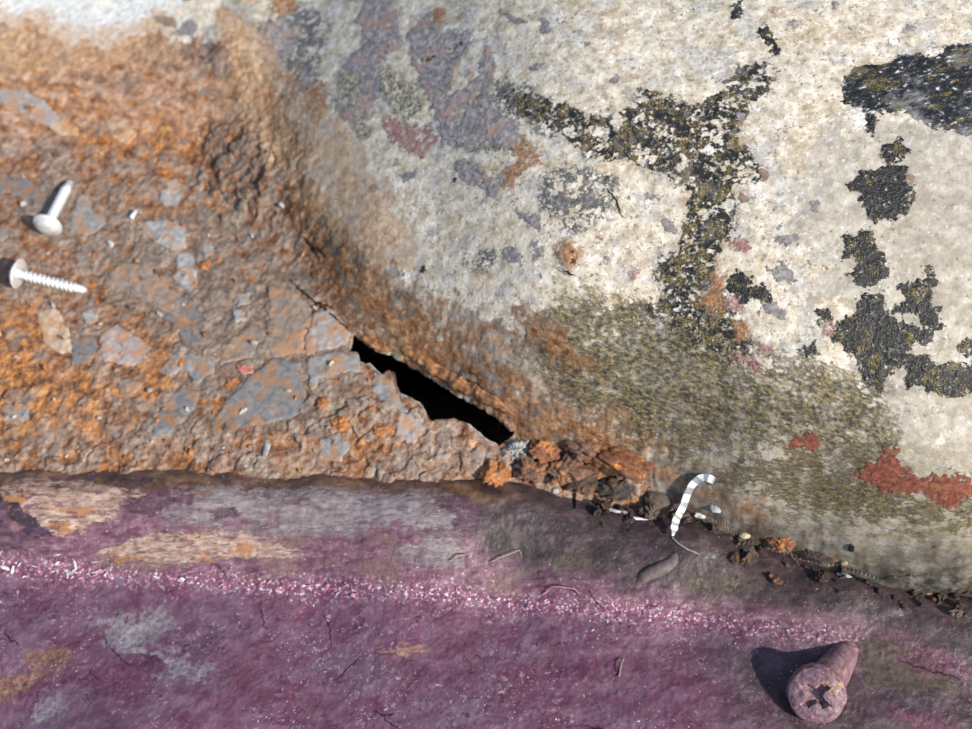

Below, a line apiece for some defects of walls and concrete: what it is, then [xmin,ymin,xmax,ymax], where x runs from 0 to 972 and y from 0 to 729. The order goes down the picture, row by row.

peeling [499,8,527,25]
peeling [540,17,551,34]
corrosion [0,88,79,137]
peeling [325,0,522,202]
corrosion [105,119,137,145]
corrosion [138,179,182,208]
corrosion [69,193,106,235]
corrosion [152,80,630,454]
corrosion [117,378,143,393]
corrosion [1,399,30,424]
corrosion [319,432,349,462]
corrosion [850,444,972,510]